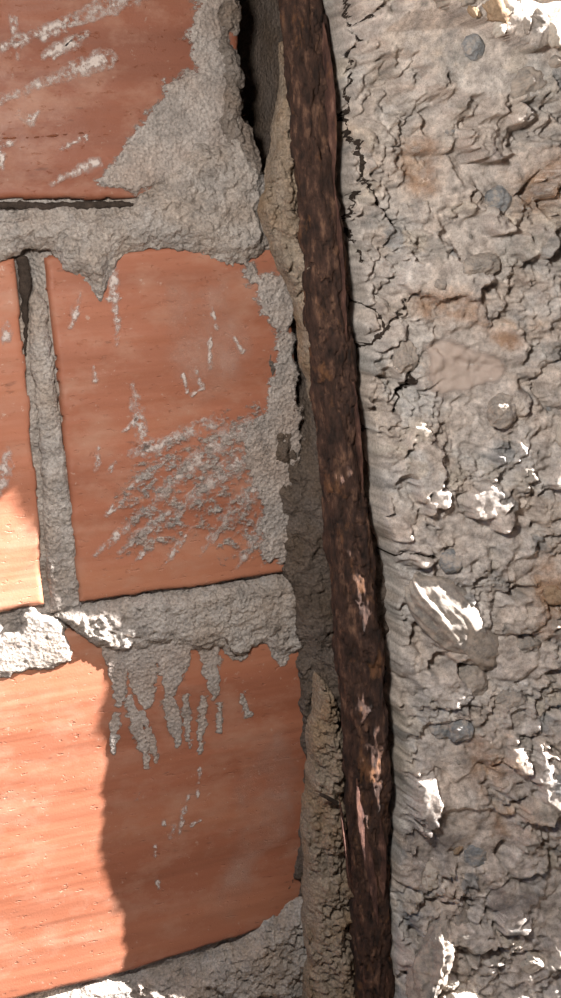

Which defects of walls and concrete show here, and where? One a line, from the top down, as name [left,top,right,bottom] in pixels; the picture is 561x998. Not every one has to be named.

crack [336,0,393,263]
crack [350,299,406,348]
rust [352,382,363,489]
crack [392,360,420,410]
spalling [323,0,561,998]
rust [339,796,350,891]
rust [356,778,386,925]